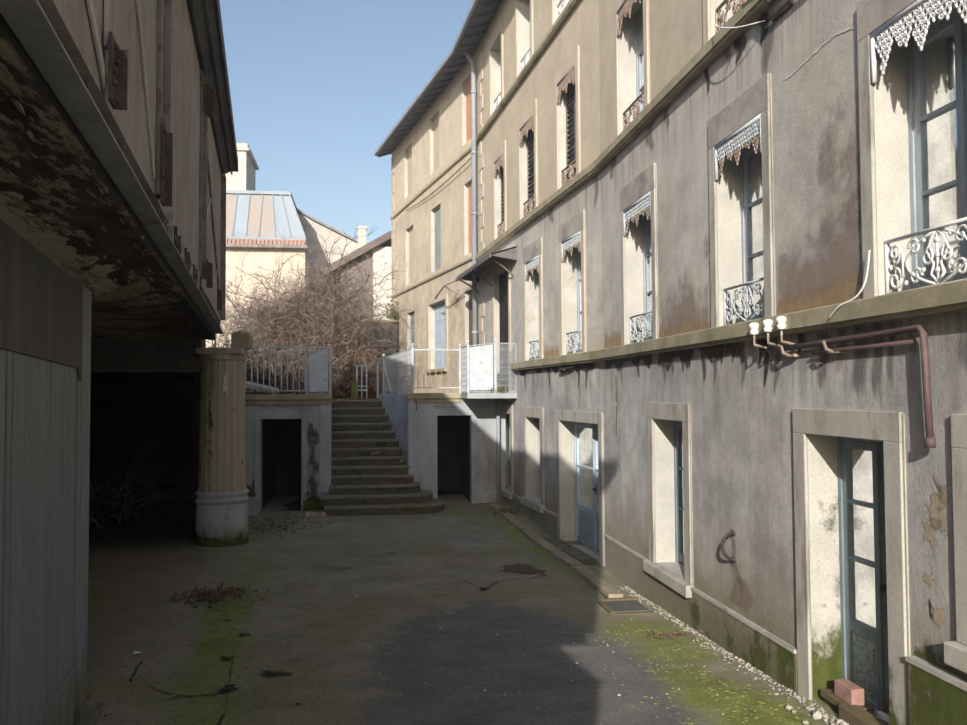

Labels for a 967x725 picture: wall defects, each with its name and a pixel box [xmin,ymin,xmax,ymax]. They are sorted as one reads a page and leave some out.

peeling [0,37,196,339]
leakage [777,189,861,315]
leakage [519,342,743,433]
leakage [757,338,769,384]
flaking render [922,474,950,547]
crack [129,655,234,725]